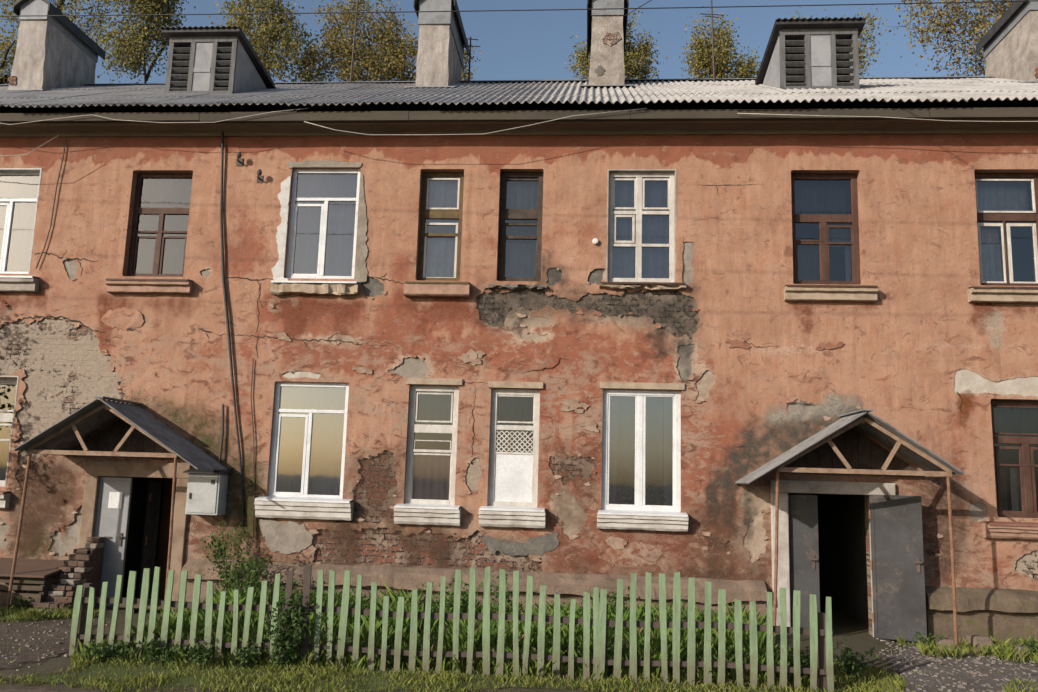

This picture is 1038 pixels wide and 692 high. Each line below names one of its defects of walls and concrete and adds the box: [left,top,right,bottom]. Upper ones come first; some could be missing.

crack [37,252,99,274]
crack [198,277,388,358]
flaking render [475,242,715,403]
flaking render [0,302,125,490]
flaking render [388,355,428,378]
flaking render [309,450,543,573]
flaking render [549,454,598,540]
damp [705,394,860,549]
flaking render [1014,550,1038,580]